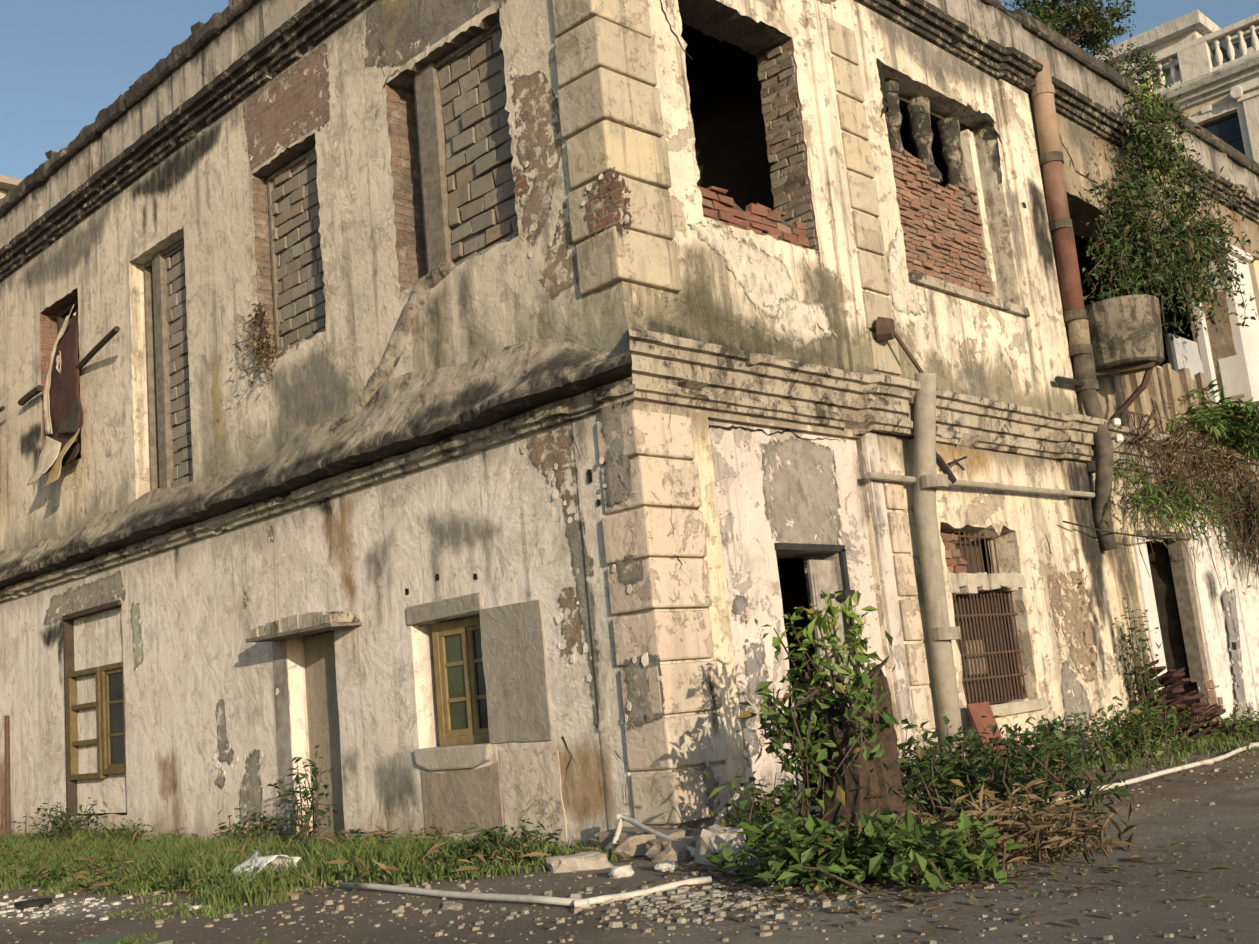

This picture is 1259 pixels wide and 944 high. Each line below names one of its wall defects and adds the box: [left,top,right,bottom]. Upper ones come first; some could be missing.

flaking render [362,0,507,68]
crack [660,0,692,59]
flaking render [243,41,331,171]
leakage [133,123,221,226]
peeling [510,69,632,299]
leakage [652,249,764,354]
peeling [687,218,838,355]
leakage [804,268,843,340]
leakage [431,520,470,545]
flaking render [520,427,603,730]
peeling [624,652,665,731]
peeling [212,699,263,824]